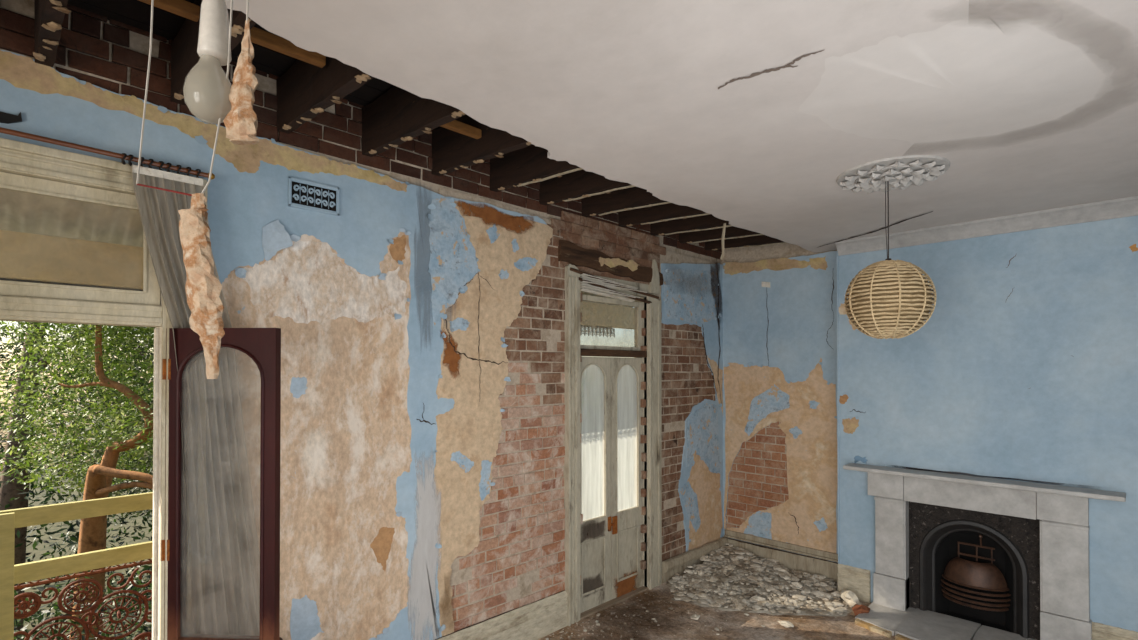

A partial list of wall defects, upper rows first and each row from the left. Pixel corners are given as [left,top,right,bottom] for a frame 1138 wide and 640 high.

flaking render [0,4,859,640]
crack [718,50,824,89]